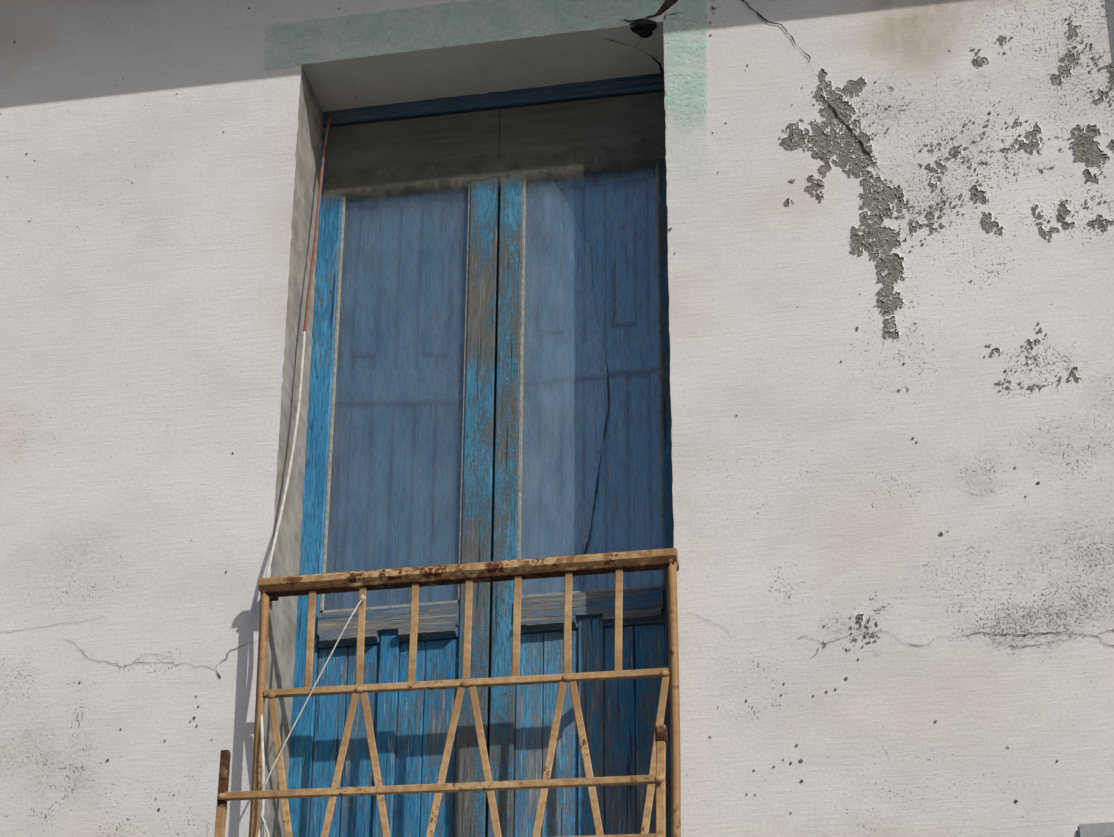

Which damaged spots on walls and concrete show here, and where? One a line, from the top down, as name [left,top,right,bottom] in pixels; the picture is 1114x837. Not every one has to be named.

crack [590,36,664,74]
crack [821,95,879,169]
peeling [742,0,1114,339]
peeling [983,322,1082,395]
crack [0,617,258,679]
crack [797,630,1114,658]